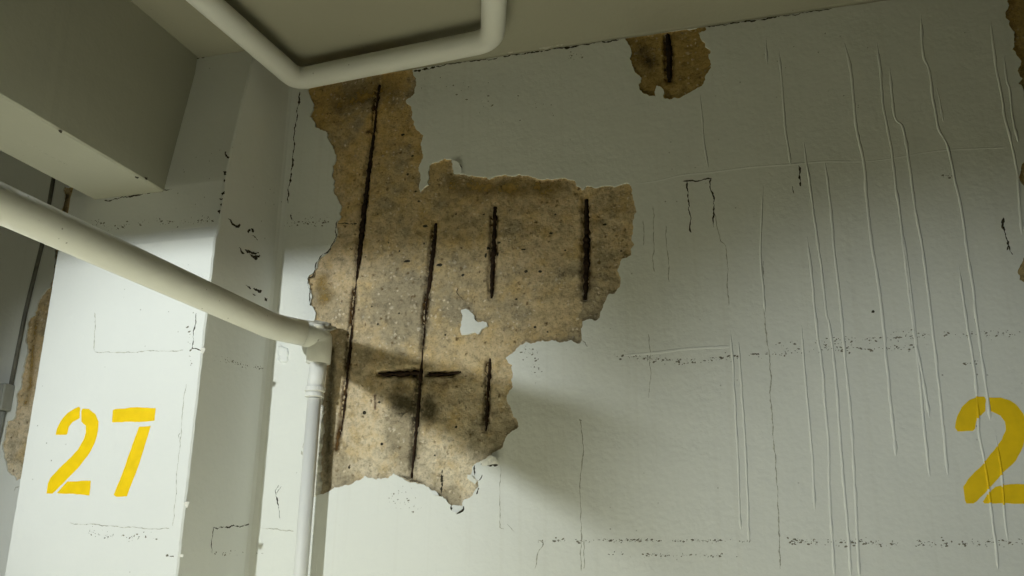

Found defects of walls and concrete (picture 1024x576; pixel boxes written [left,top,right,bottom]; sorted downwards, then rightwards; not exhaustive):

spalling [626,27,711,99]
spalling [62,187,73,213]
crack [287,93,300,219]
spalling [309,70,637,513]
crack [643,178,729,303]
crack [1001,218,1013,255]
spalling [3,250,59,480]
rust [334,289,356,452]
crack [762,262,781,566]